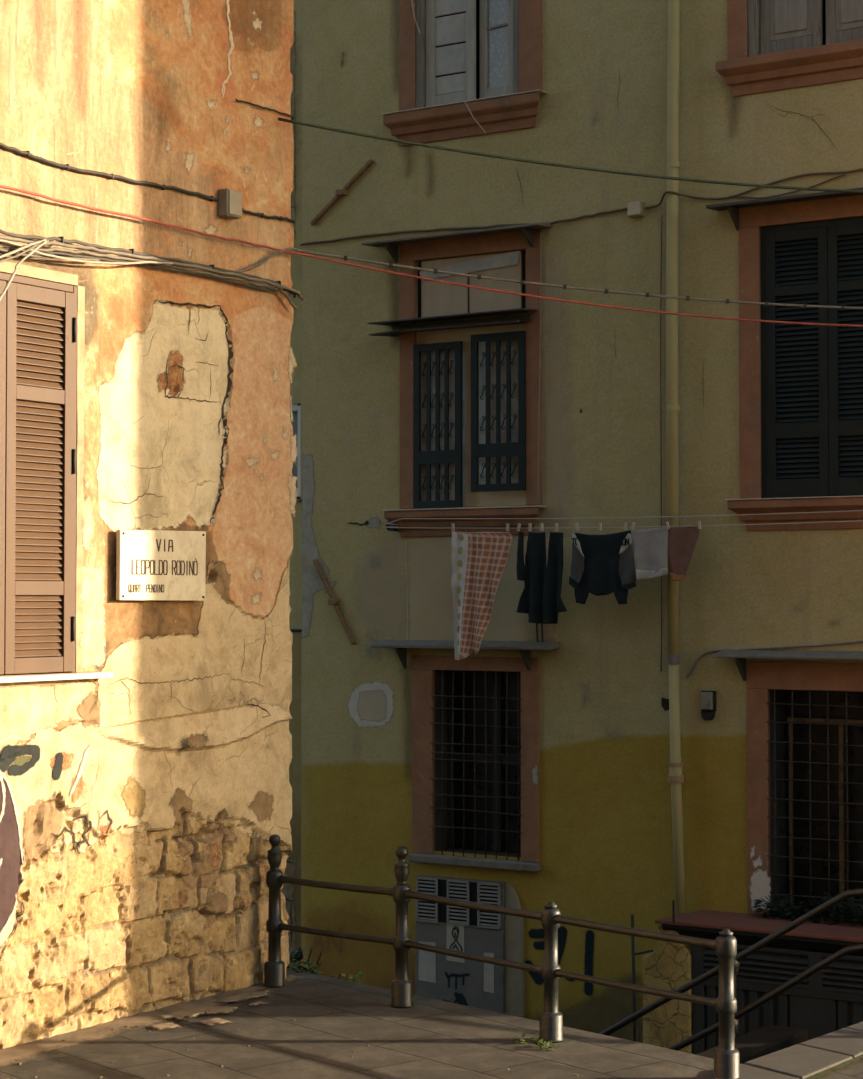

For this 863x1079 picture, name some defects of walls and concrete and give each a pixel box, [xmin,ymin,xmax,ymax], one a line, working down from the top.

crack [222,0,234,96]
peeling [81,298,233,553]
crack [158,300,234,524]
flaking render [0,348,336,1049]
peeling [749,846,771,911]